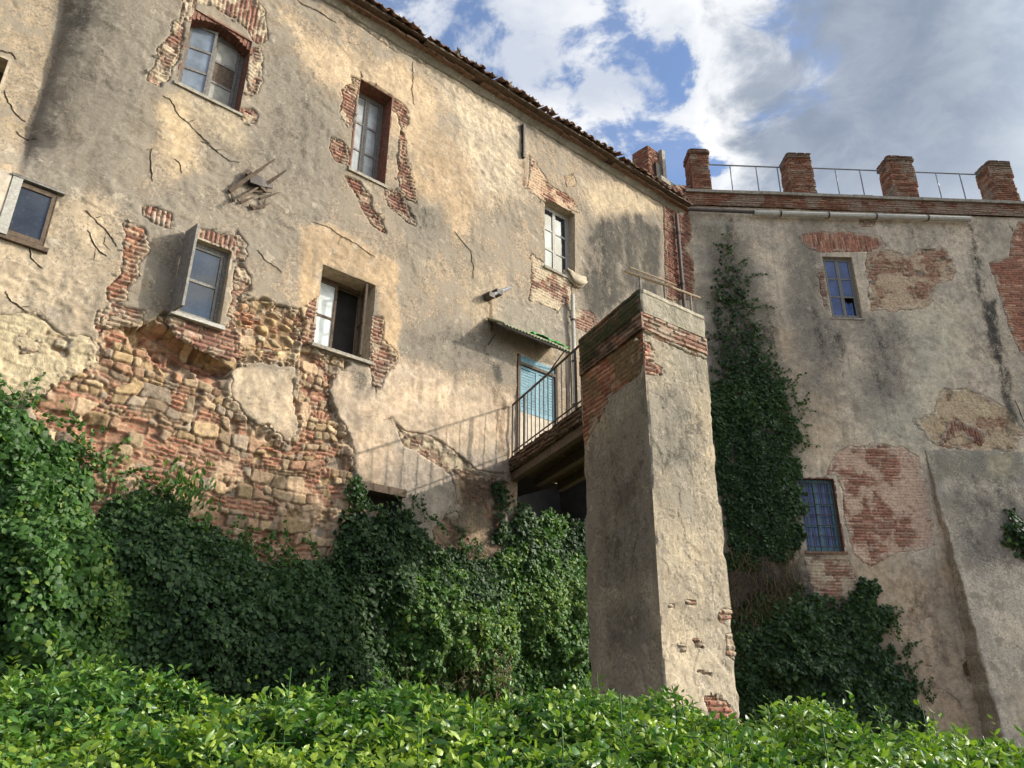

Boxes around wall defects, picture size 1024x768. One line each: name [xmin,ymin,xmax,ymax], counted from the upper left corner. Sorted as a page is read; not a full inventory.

flaking render [144,0,272,96]
crack [3,90,35,141]
crack [164,96,240,163]
flaking render [329,76,423,233]
flaking render [525,155,579,214]
crack [86,211,116,258]
flaking render [799,219,955,313]
flaking render [989,221,1024,356]
flaking render [0,205,358,574]
flaking render [369,317,399,390]
flaking render [582,329,707,445]
flaking render [803,443,935,601]